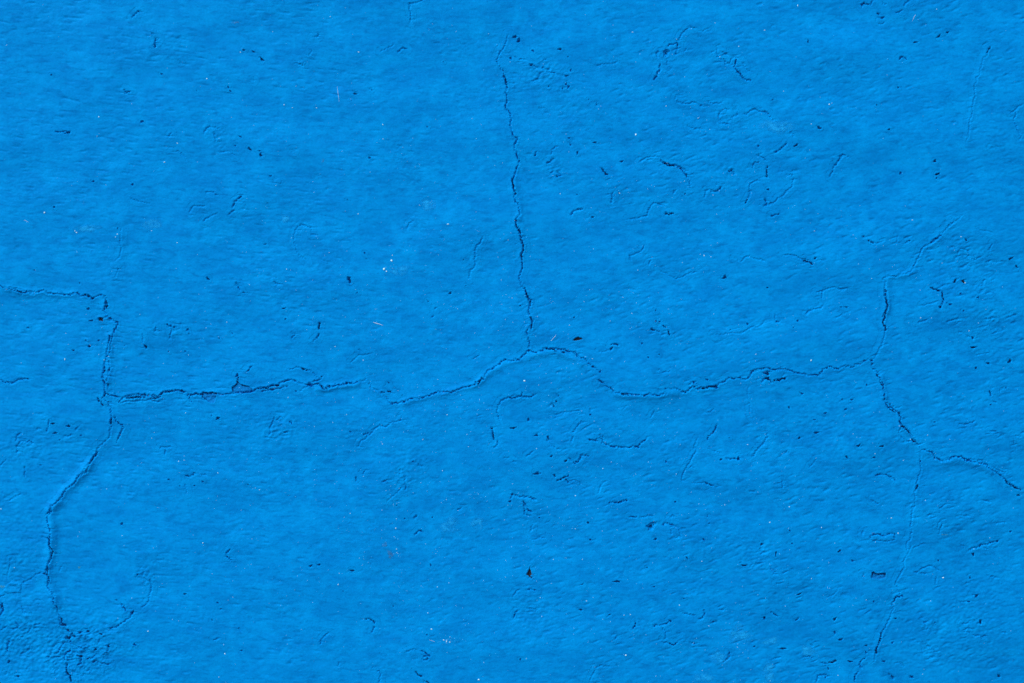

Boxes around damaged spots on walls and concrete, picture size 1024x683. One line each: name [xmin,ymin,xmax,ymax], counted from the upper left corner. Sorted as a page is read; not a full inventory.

crack [514,53,561,87]
crack [50,126,76,139]
crack [596,22,799,225]
crack [541,141,567,182]
crack [825,149,857,182]
crack [184,191,248,220]
crack [490,28,540,350]
crack [0,210,1024,634]
crack [0,590,36,657]
crack [950,590,987,642]
crack [401,644,435,683]
crack [883,668,919,683]